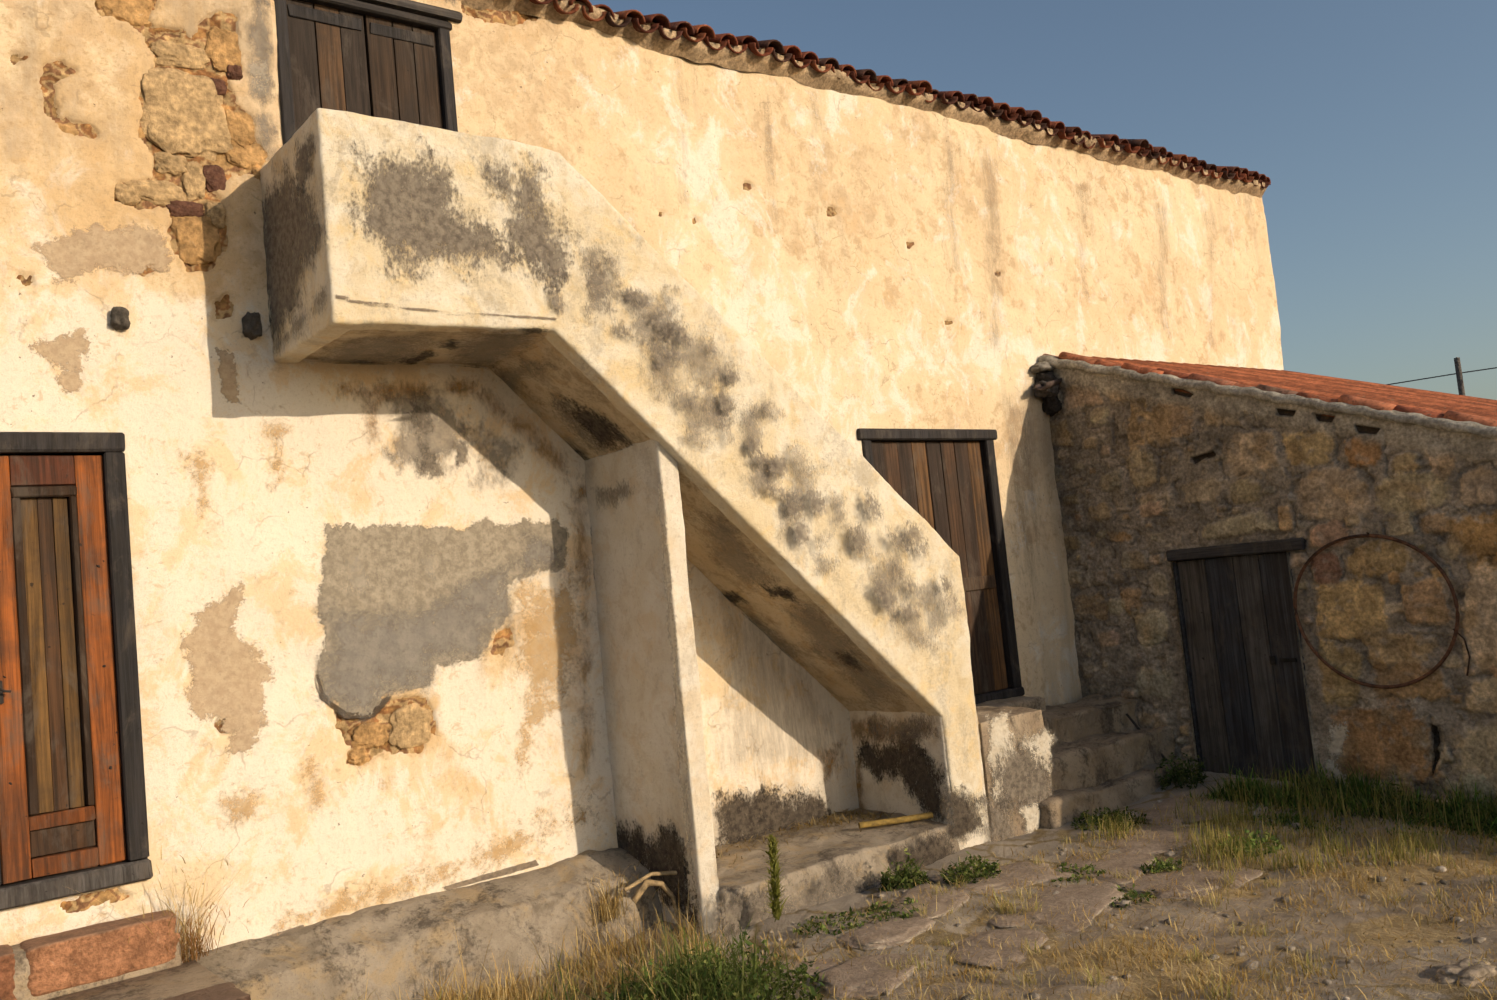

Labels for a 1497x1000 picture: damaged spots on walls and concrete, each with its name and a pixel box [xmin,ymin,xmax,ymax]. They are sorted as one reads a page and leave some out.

spalling [10,54,28,65]
spalling [17,0,268,286]
leakage [249,0,328,345]
leakage [322,136,960,649]
peeling [180,581,276,755]
spalling [335,696,436,766]
peeling [490,580,576,766]
leakage [700,513,1055,871]
mould [616,819,877,940]